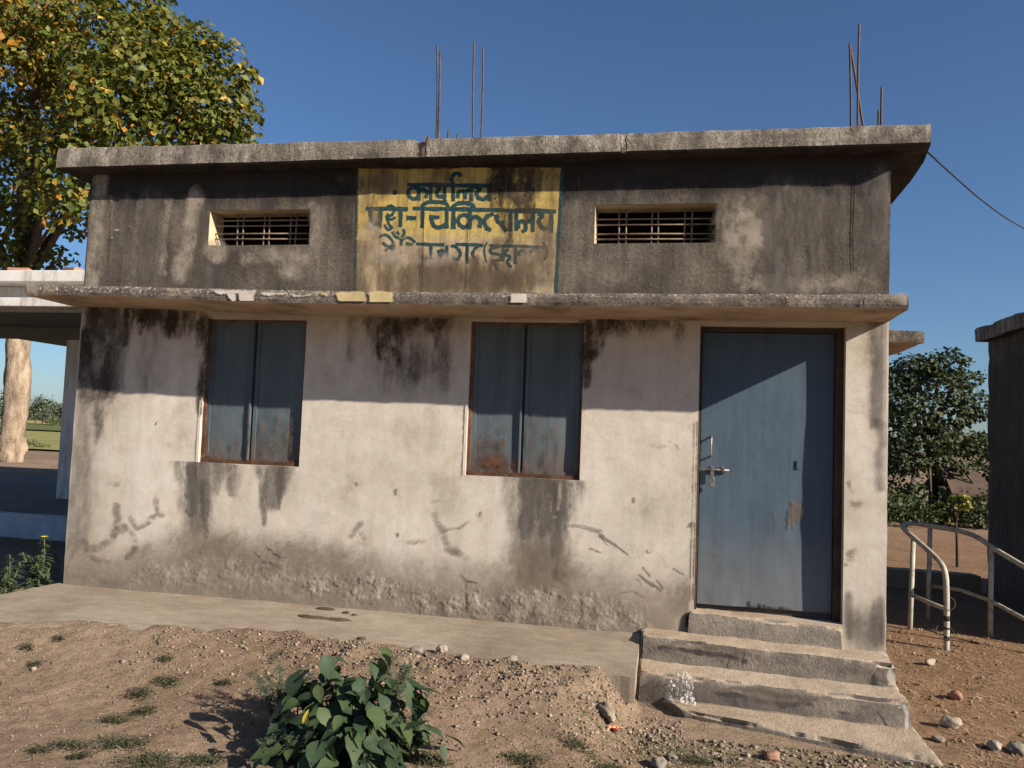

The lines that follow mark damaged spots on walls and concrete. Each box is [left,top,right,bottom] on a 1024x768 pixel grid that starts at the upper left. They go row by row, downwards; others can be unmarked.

water stain [364,317,448,374]
water stain [582,319,683,388]
water stain [70,307,212,504]
corrosion [467,390,581,480]
water stain [73,461,604,628]